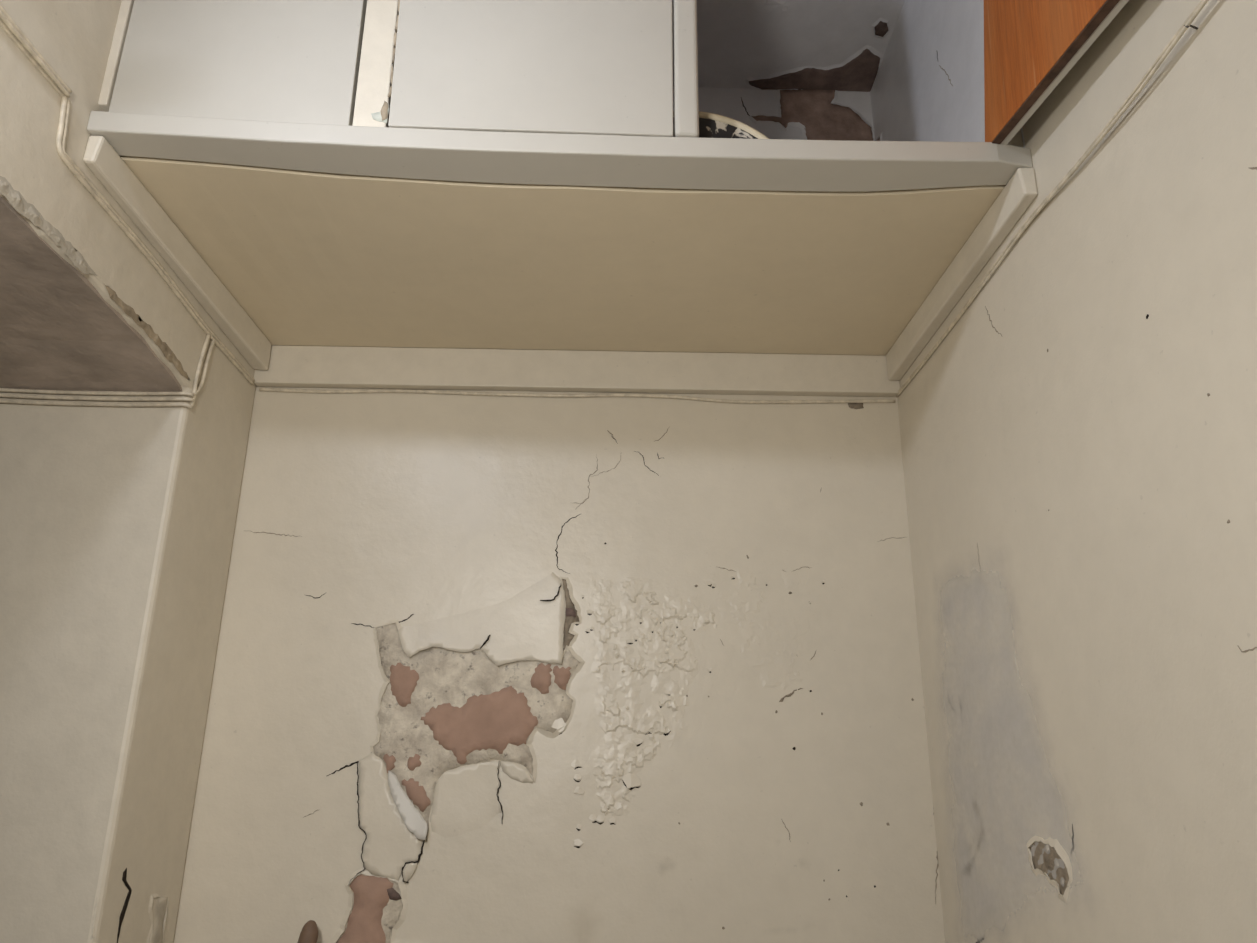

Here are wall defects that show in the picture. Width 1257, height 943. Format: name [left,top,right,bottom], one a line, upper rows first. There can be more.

peeling [741,18,891,141]
spalling [0,176,189,380]
crack [555,426,670,574]
peeling [327,572,585,943]
crack [117,868,132,943]
spalling [1026,824,1074,905]